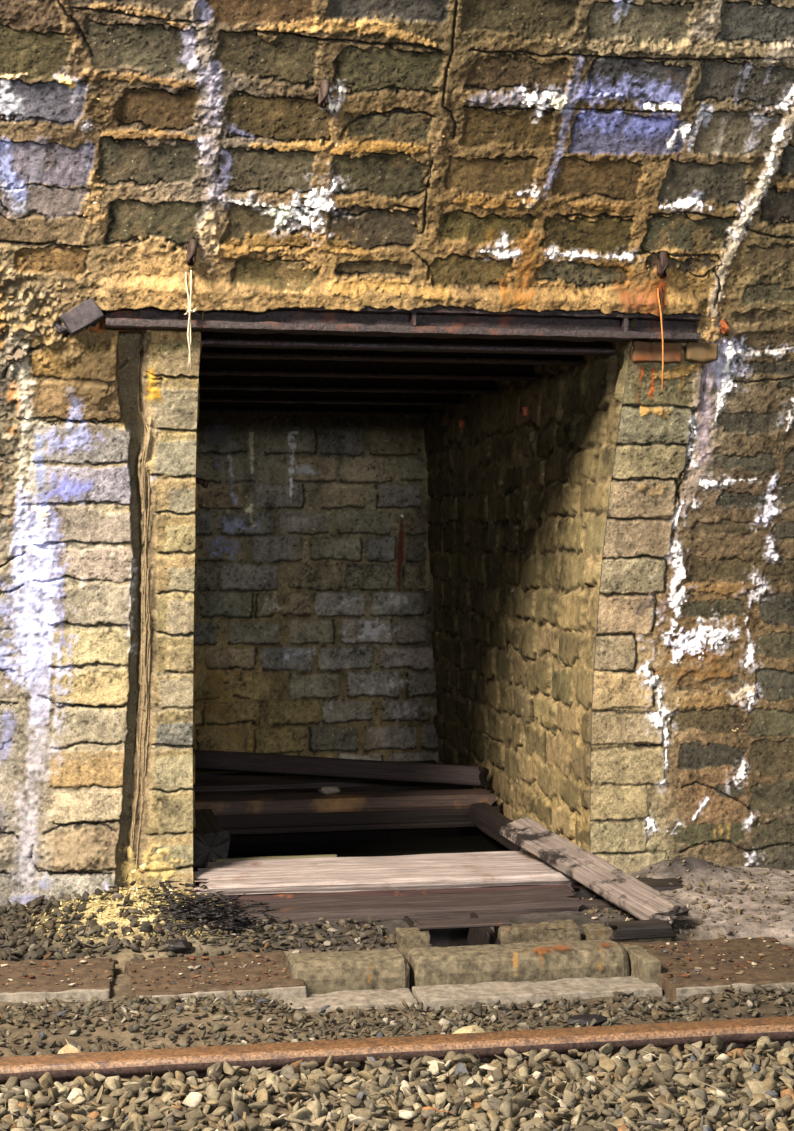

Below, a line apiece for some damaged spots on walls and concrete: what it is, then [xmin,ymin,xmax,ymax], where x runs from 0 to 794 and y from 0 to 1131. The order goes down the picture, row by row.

damp [180,28,252,137]
damp [196,138,337,231]
damp [518,75,727,211]
damp [733,128,786,238]
damp [548,251,634,262]
damp [687,339,794,467]
damp [700,475,779,561]
damp [0,345,91,905]
damp [662,542,767,668]
damp [639,663,670,785]
crack [682,781,750,809]
crack [681,840,794,852]